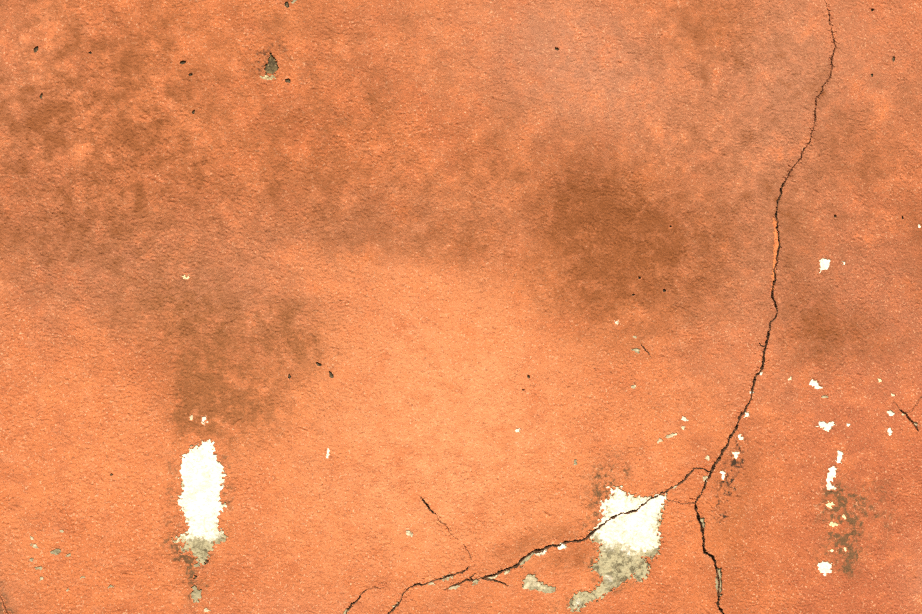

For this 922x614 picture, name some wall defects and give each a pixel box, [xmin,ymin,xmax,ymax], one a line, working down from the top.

crack [343,1,837,614]
flaking render [172,439,228,612]
flaking render [567,484,669,612]